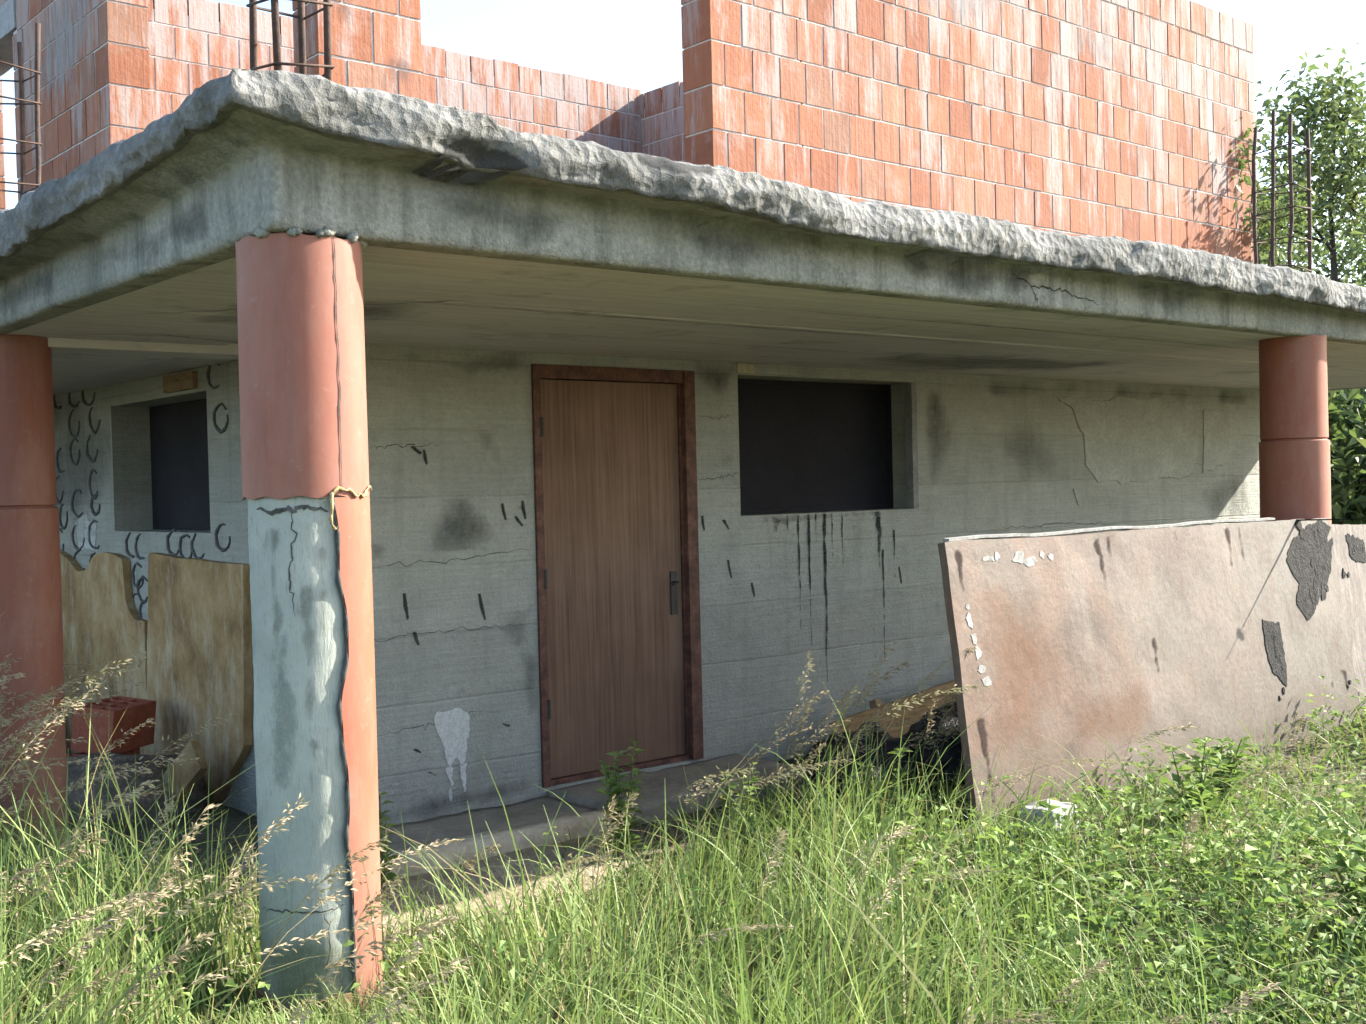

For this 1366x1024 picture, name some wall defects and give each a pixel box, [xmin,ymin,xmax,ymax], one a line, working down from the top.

crack [256,236,1255,615]
crack [374,624,516,642]
water stain [773,514,843,656]
water stain [875,511,895,653]
peeling [1262,619,1287,701]
peeling [1286,519,1366,621]
peeling [333,500,356,993]
water stain [432,763,467,808]
crack [264,904,346,976]